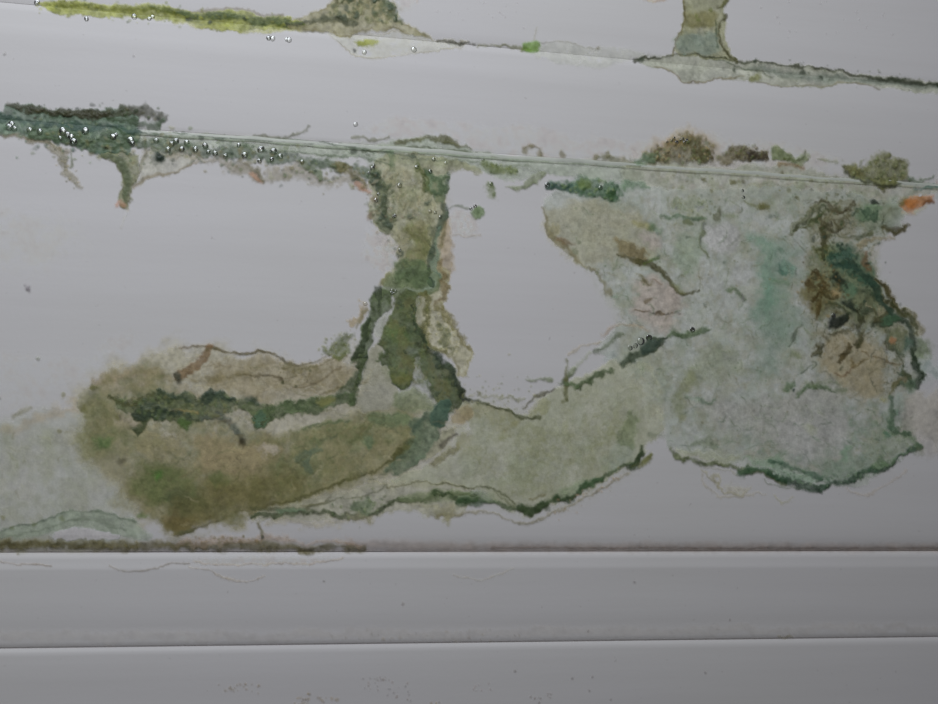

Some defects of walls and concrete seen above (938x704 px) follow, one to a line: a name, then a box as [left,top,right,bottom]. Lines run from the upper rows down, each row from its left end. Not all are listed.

mould [137,151,192,184]
leakage [637,259,694,296]
leakage [352,318,371,358]
leakage [365,273,472,475]
leakage [550,329,709,401]
leakage [833,243,924,435]